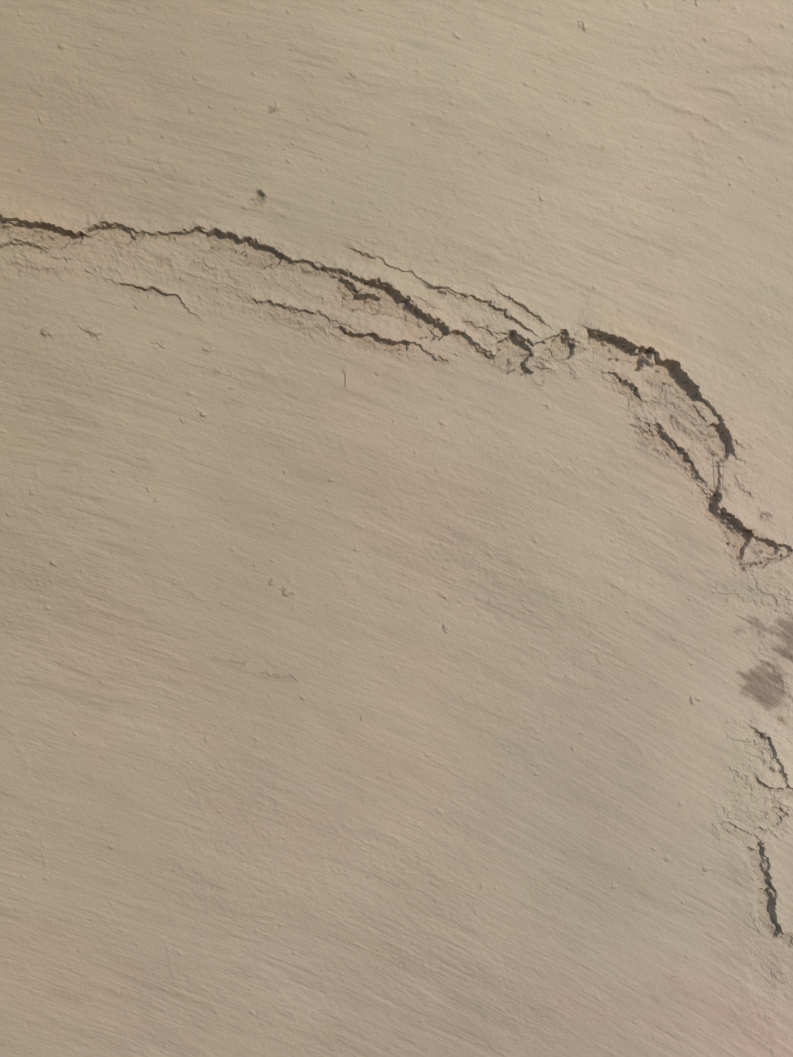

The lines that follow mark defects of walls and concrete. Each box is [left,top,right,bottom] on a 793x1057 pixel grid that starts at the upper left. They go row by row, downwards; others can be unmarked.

crack [0,190,793,619]
crack [713,646,793,1057]